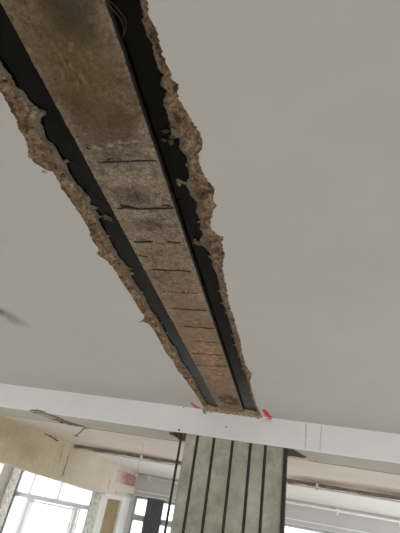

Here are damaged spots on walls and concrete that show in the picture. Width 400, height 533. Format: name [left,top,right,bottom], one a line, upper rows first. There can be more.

crack [97,158,162,182]
flaking render [0,0,263,419]
crack [117,203,174,211]
crack [183,326,227,379]